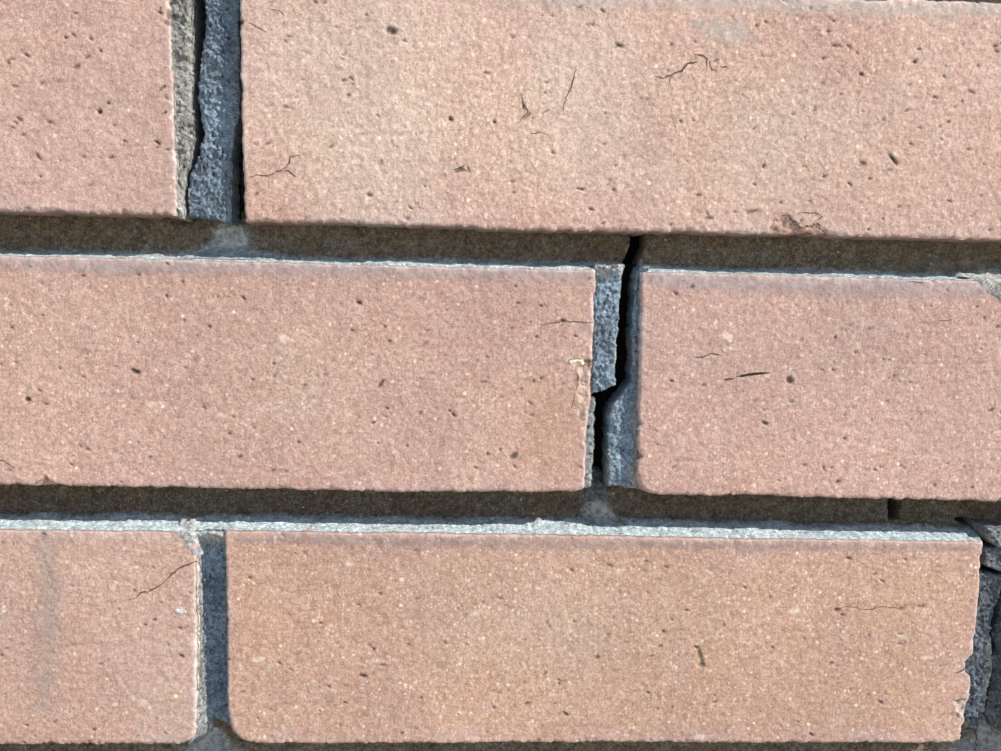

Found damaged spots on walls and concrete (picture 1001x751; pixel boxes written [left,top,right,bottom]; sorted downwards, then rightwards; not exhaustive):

crack [544,236,639,470]
crack [979,539,998,572]